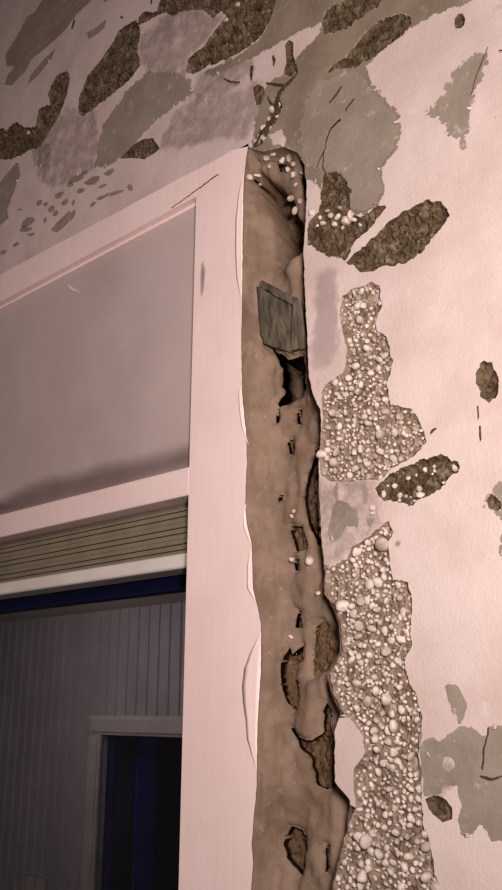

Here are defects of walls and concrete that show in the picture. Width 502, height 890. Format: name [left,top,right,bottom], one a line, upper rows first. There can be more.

flaking render [0,71,80,225]
crack [224,55,298,145]
peeling [78,0,471,261]
peeling [426,52,489,150]
peeling [20,217,35,236]
peeling [36,163,107,232]
flaking render [235,147,502,890]